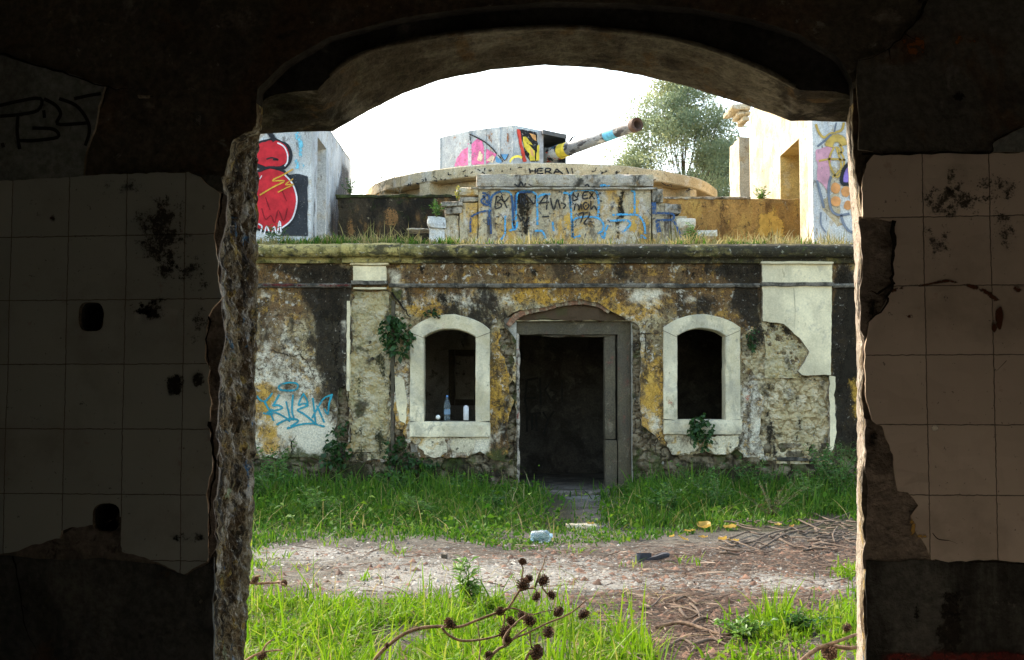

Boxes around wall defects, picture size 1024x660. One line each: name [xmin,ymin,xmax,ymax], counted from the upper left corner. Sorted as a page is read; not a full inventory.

mould [134,195,208,291]
mould [925,169,1016,247]
leakage [302,268,348,391]
spalling [741,318,832,464]
leakage [833,270,877,402]
leakage [849,425,878,454]